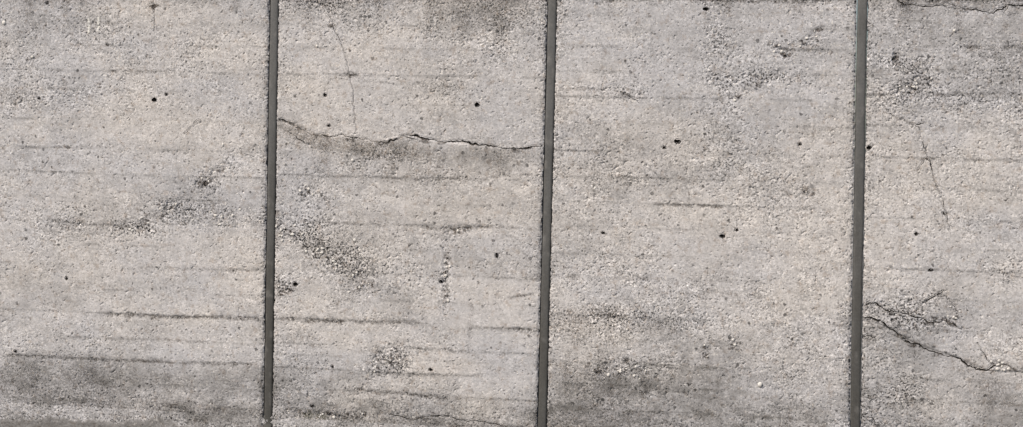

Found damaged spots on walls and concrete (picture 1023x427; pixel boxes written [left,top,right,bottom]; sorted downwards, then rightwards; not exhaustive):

crack [279,0,541,152]
crack [863,290,1023,373]